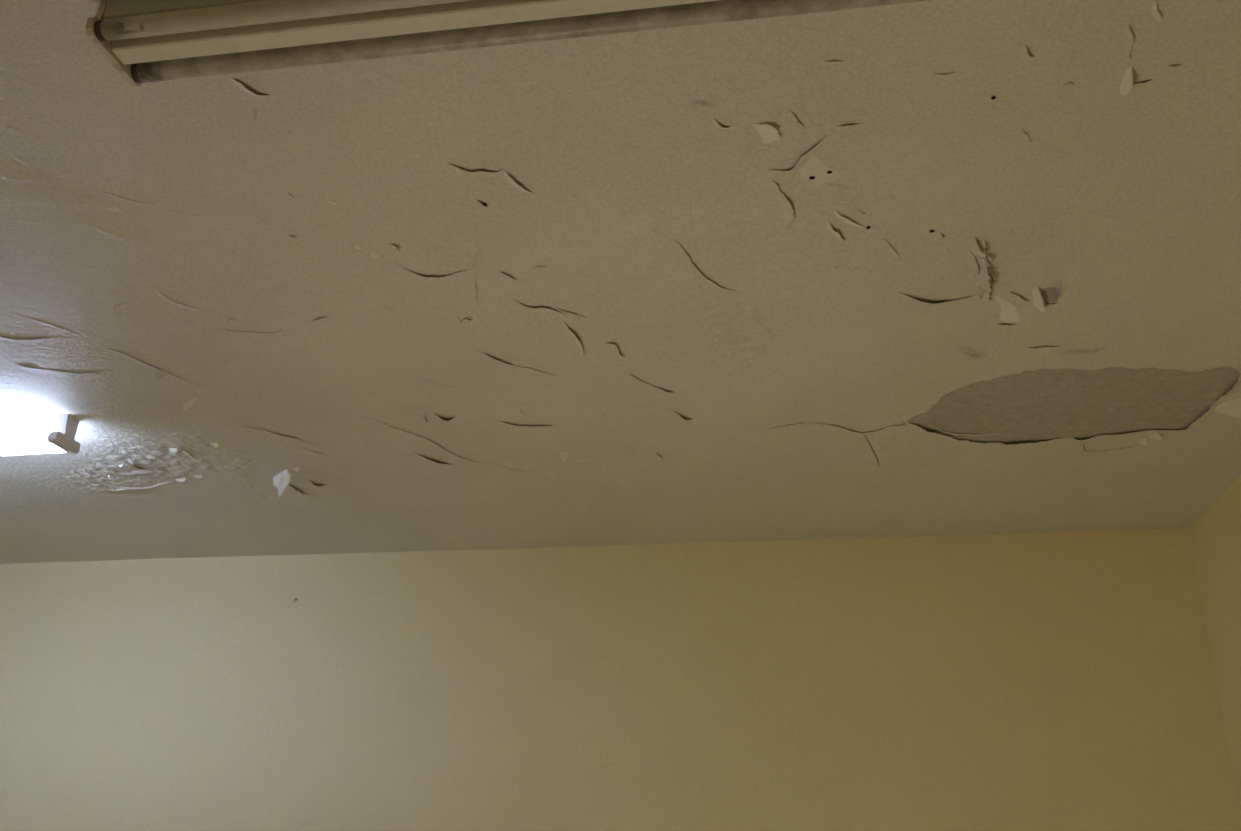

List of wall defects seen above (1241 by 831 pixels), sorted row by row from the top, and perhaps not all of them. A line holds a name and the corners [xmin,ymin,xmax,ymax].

peeling [751,123,781,145]
spalling [899,359,1241,445]
flaking render [63,429,325,499]
crack [769,422,905,463]